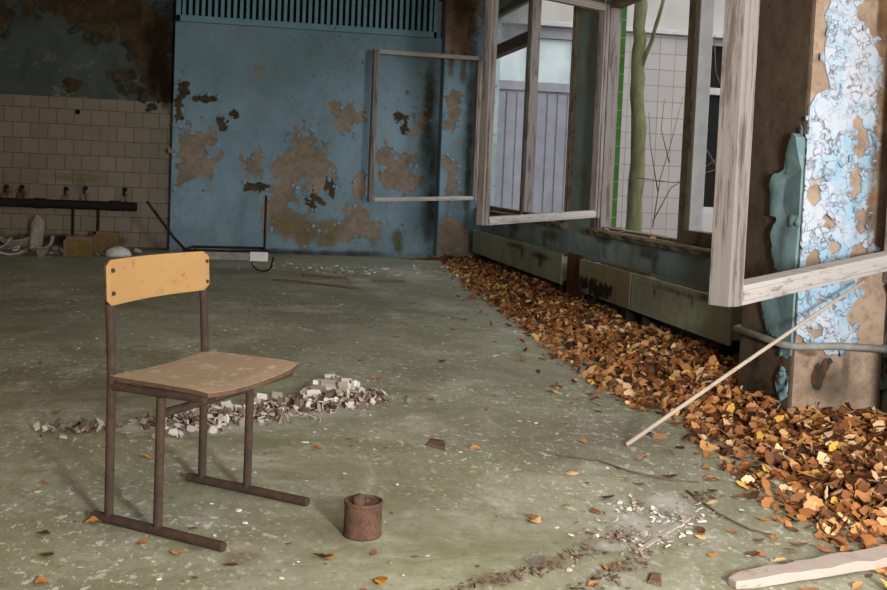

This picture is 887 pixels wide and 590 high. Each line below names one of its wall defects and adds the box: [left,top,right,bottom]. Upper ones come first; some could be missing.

peeling [0,0,239,192]
peeling [239,122,424,249]
peeling [328,99,369,140]
peeling [393,88,465,136]
peeling [437,154,474,258]
water stain [461,73,475,142]
peeling [769,0,884,273]
peeling [761,278,866,401]